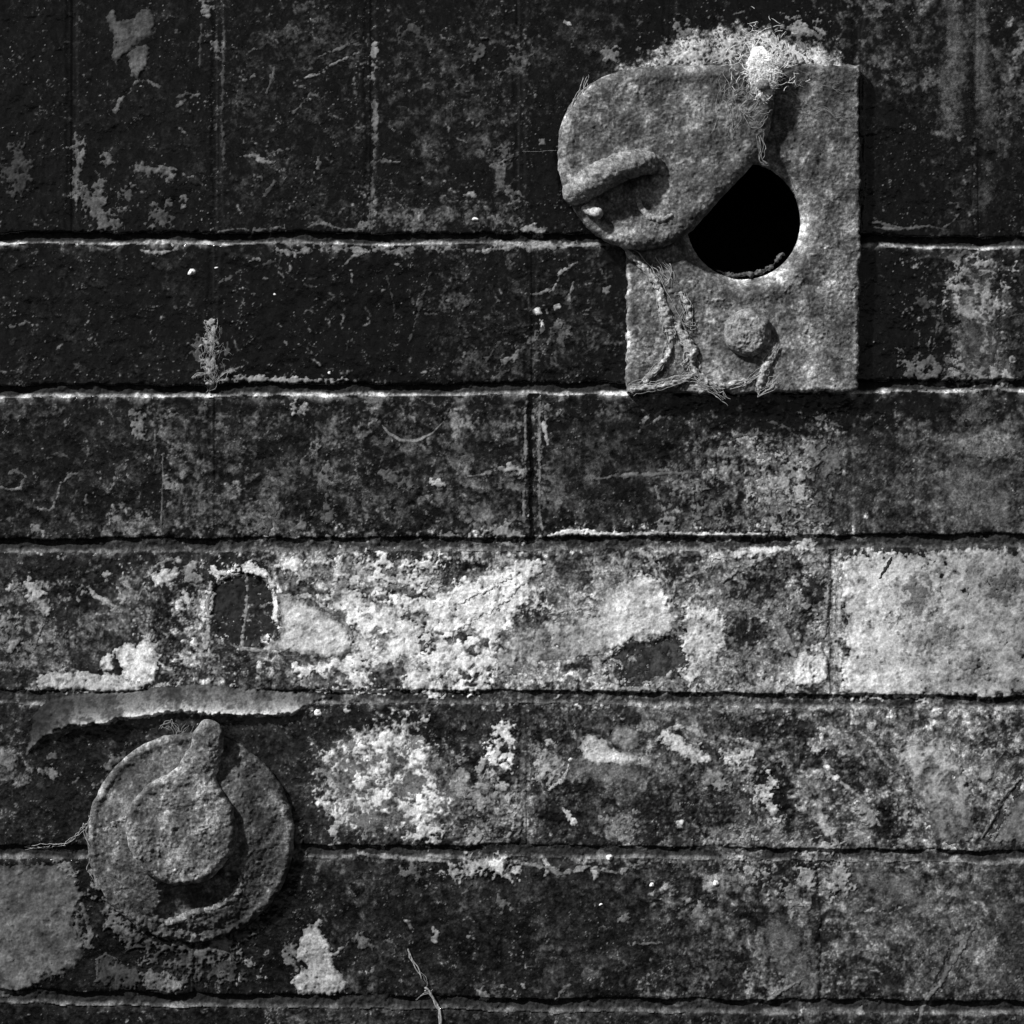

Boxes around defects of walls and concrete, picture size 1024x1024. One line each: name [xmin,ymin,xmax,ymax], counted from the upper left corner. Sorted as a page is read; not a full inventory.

peeling [128,407,179,456]
peeling [284,396,310,416]
peeling [638,406,674,433]
peeling [0,468,27,491]
peeling [30,440,90,538]
peeling [36,640,174,695]
peeling [76,416,1024,924]
peeling [281,918,348,996]
peeling [352,931,393,953]
peeling [617,912,663,946]
peeling [476,984,516,1002]